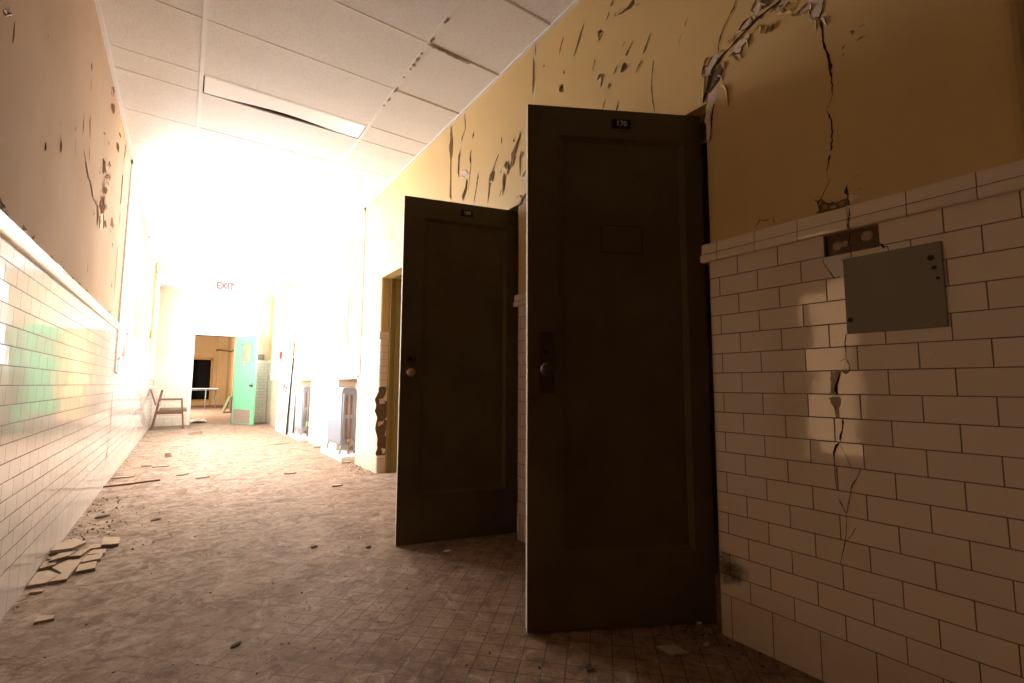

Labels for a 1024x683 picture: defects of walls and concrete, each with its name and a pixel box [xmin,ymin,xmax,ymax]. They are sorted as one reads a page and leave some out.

peeling [83,86,126,291]
peeling [449,120,470,201]
peeling [487,130,526,208]
peeling [532,43,545,102]
peeling [701,0,827,143]
crack [819,18,835,172]
spalling [375,387,387,456]
crack [829,337,861,564]